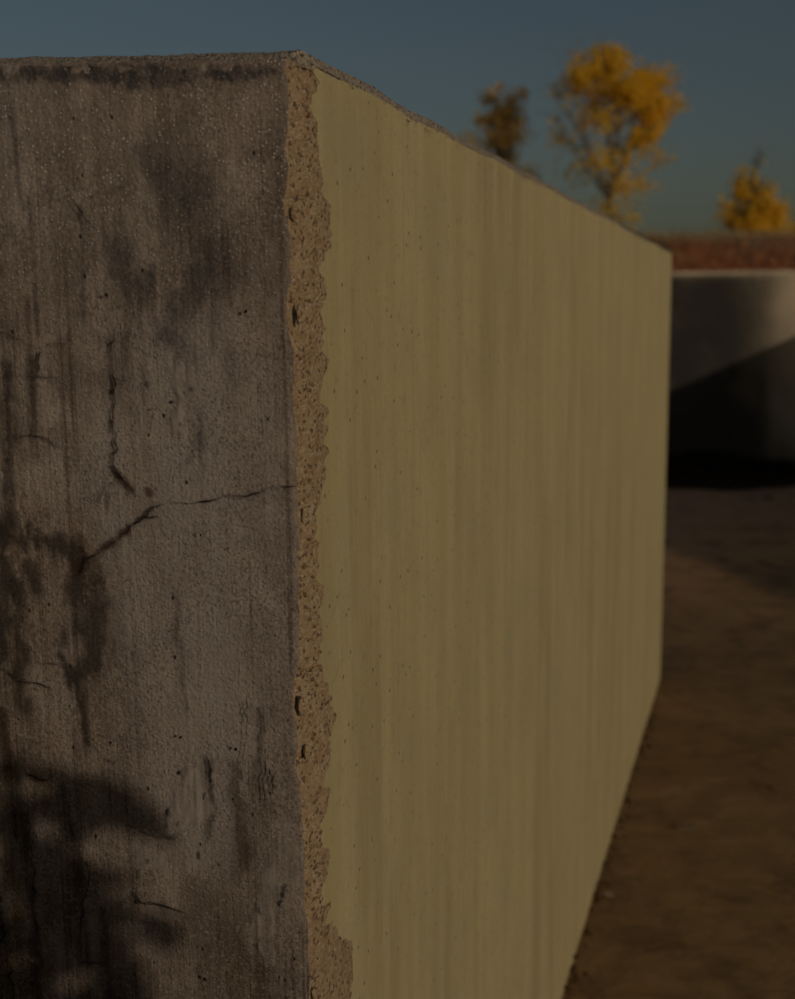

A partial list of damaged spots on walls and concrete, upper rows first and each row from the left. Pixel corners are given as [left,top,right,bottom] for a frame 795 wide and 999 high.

damp [21,63,168,89]
crack [110,337,130,487]
crack [79,486,293,573]
damp [11,561,40,714]